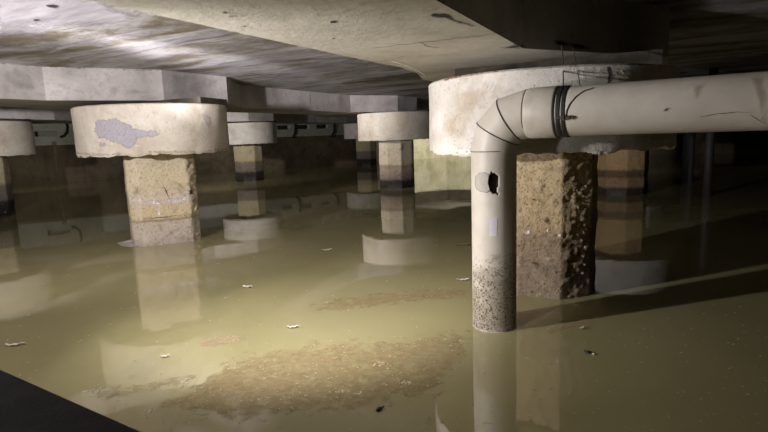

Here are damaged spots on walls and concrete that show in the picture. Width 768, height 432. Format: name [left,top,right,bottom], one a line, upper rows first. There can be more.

peeling [79,117,195,156]